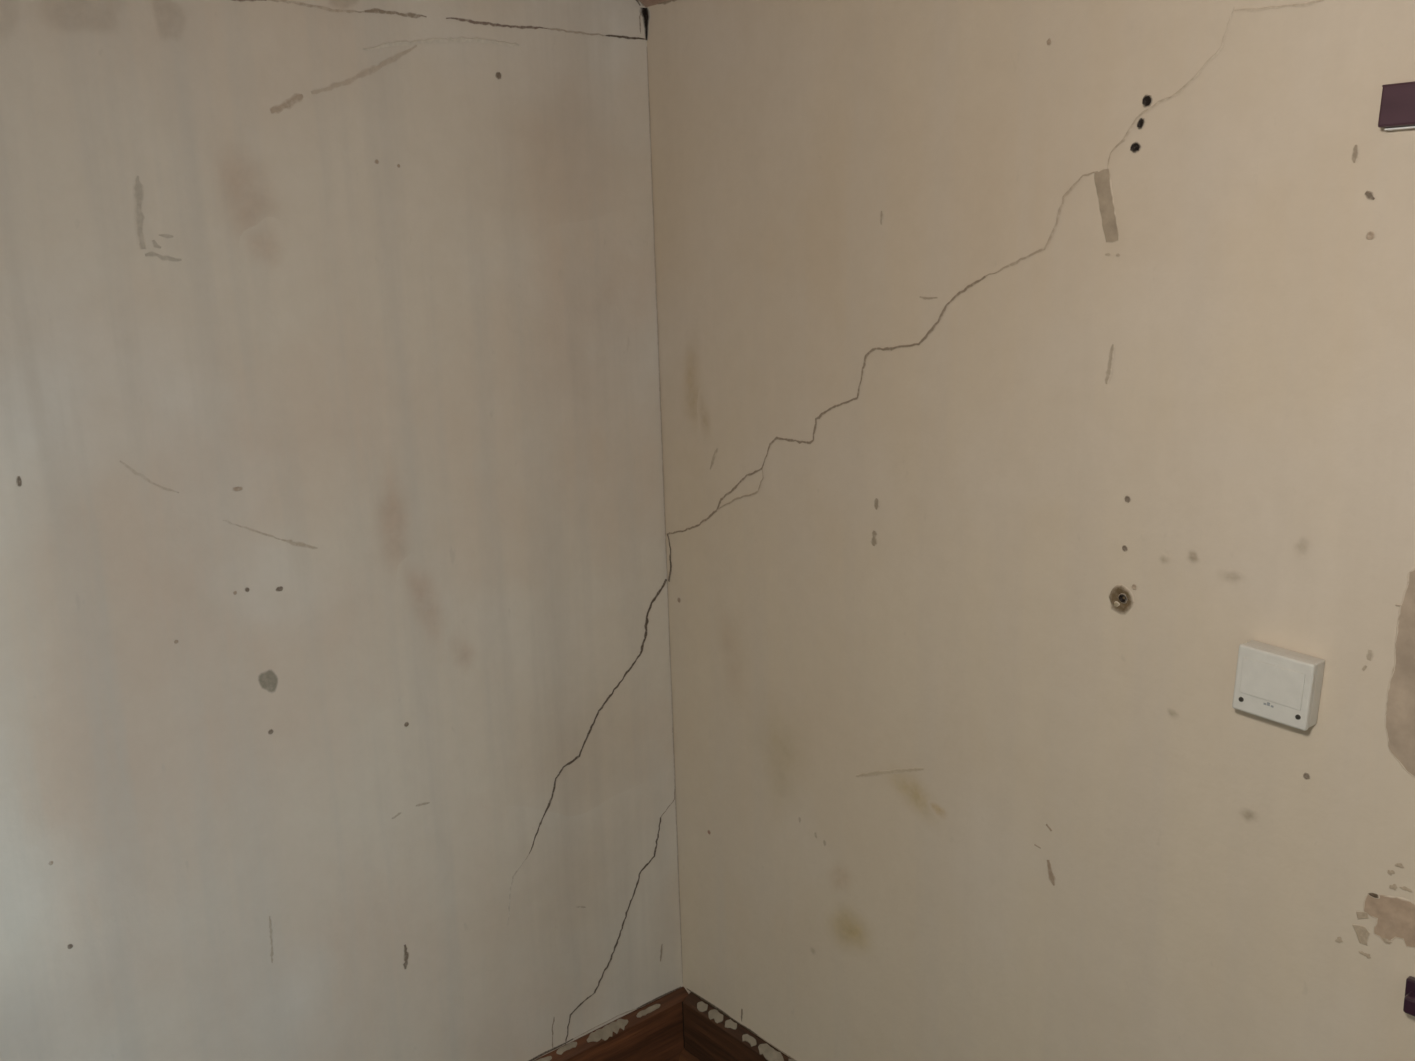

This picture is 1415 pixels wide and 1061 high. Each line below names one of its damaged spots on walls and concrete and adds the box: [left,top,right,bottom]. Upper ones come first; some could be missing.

crack [222,0,1323,1048]
peeling [1384,568,1415,778]
peeling [1335,863,1415,959]
peeling [697,1001,795,1061]